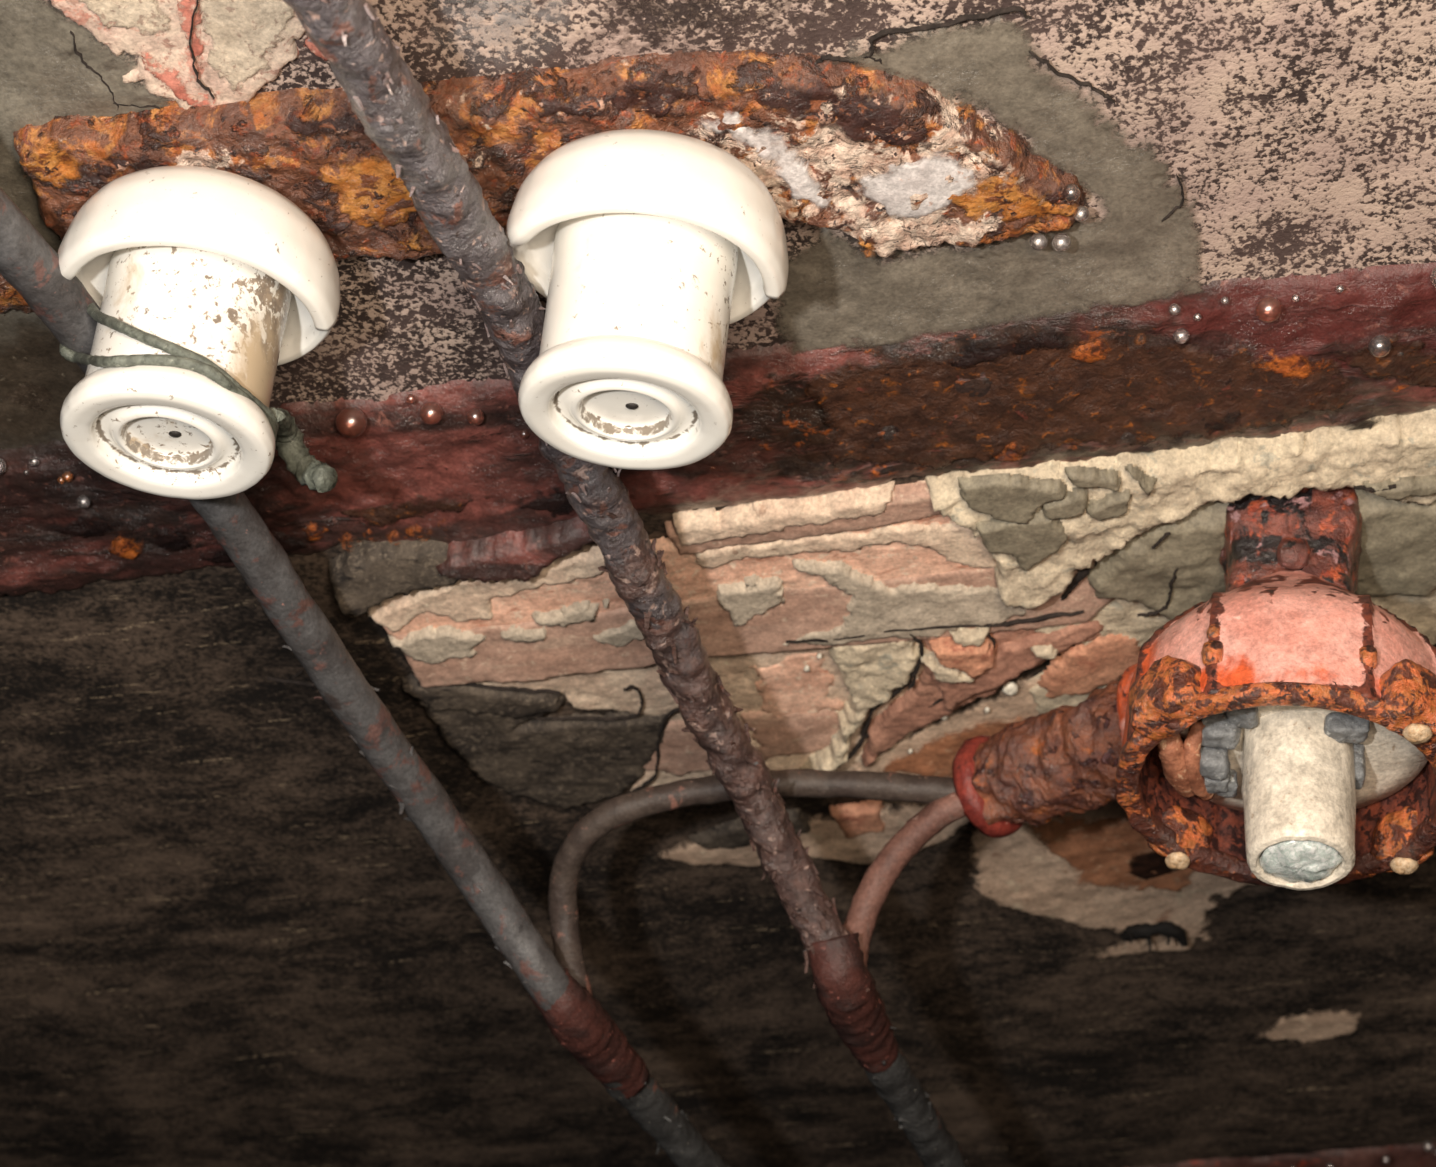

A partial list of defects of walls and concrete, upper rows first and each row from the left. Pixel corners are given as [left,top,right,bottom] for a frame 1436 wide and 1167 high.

peeling [51,0,328,109]
crack [189,0,215,100]
corrosion [732,76,931,150]
corrosion [20,142,80,189]
corrosion [319,155,431,253]
corrosion [947,156,1077,224]
corrosion [806,328,1436,470]
flaking render [650,408,1436,778]
flaking render [367,516,715,791]
flaking render [786,800,927,865]
flaking render [920,801,1257,959]
flaking render [1265,1010,1361,1044]